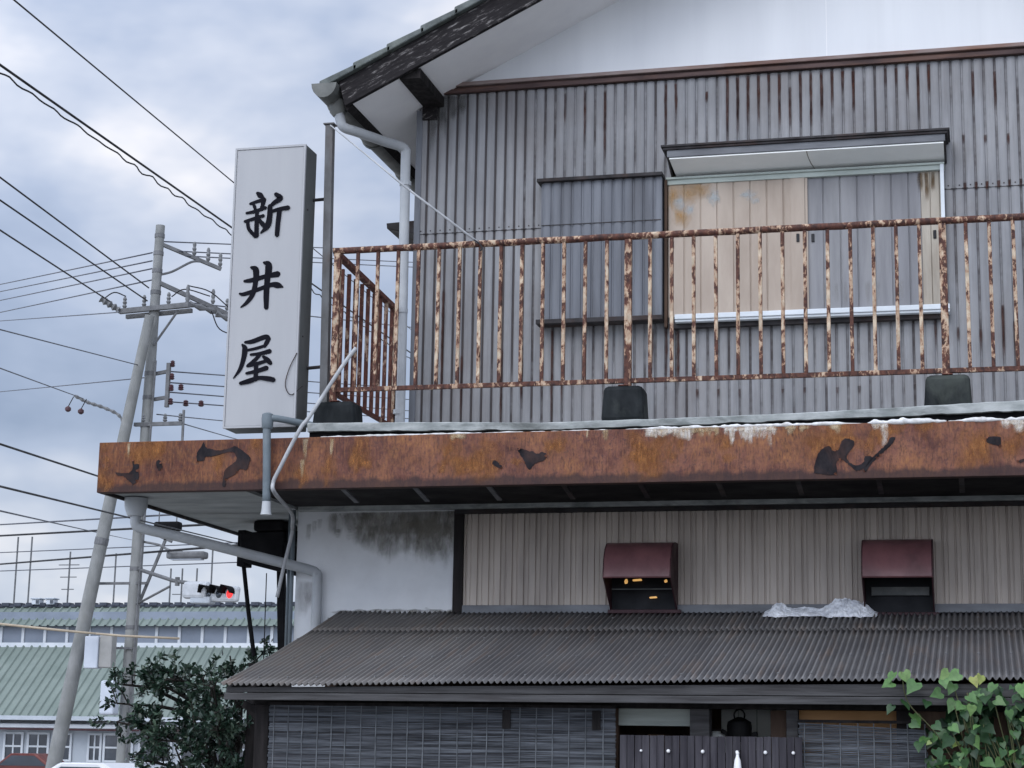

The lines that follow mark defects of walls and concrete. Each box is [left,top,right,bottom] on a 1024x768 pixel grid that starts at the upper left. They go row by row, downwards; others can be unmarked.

corrosion [1001,305,1016,351]
corrosion [551,330,563,399]
corrosion [652,329,680,377]
peeling [115,460,139,484]
peeling [196,442,251,487]
peeling [517,447,547,470]
peeling [814,437,895,475]
peeling [986,436,1001,448]